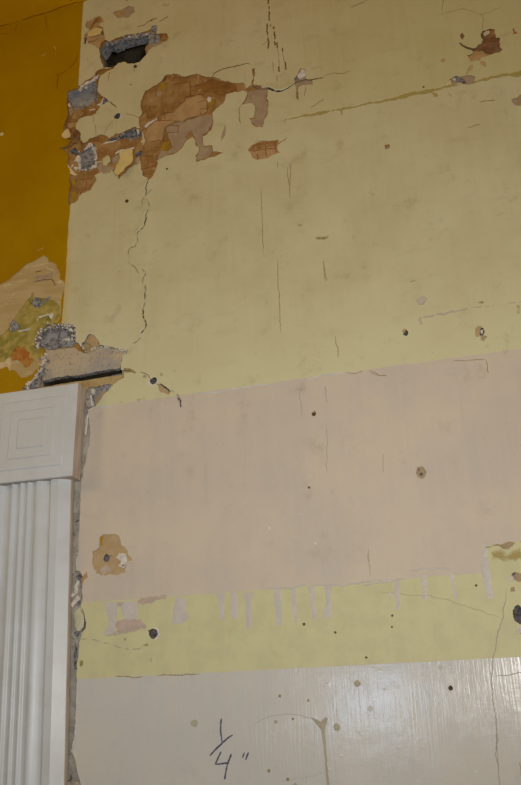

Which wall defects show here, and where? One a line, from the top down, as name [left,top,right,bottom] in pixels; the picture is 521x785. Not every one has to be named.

peeling [59,16,269,205]
peeling [248,140,280,160]
crack [252,71,349,92]
peeling [446,29,502,86]
crack [121,179,152,344]
peeling [0,255,182,409]
peeling [71,534,132,631]
peeling [509,572,521,592]
crack [382,592,521,785]